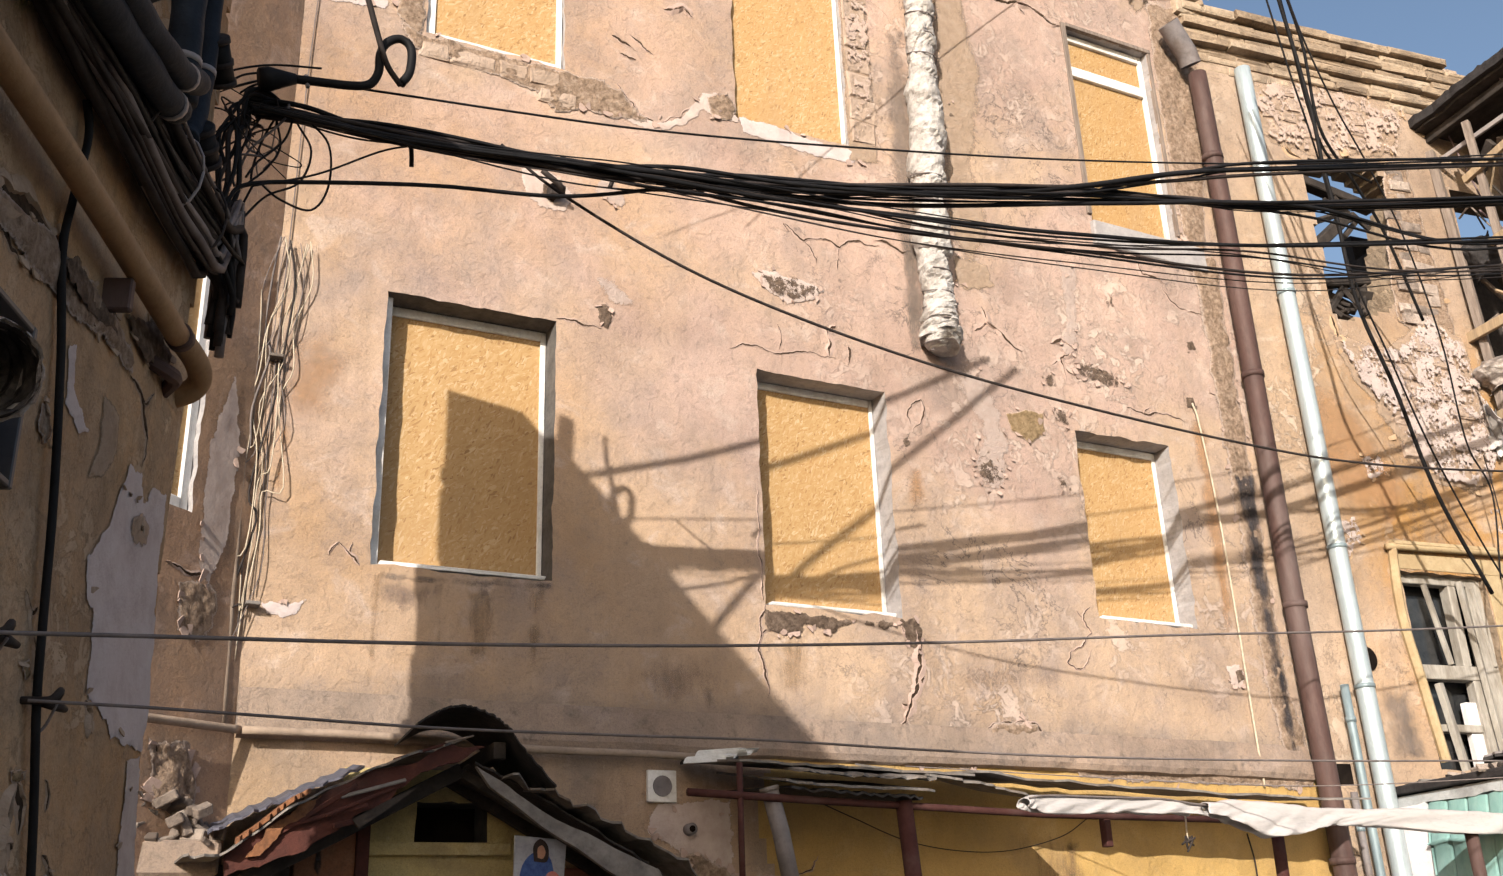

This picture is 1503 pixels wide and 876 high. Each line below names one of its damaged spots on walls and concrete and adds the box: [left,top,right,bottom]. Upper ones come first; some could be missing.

flaking render [332,0,878,166]
flaking render [934,0,994,290]
flaking render [0,172,135,373]
flaking render [177,376,246,642]
flaking render [751,266,824,304]
crack [729,324,852,365]
crack [782,222,914,270]
flaking render [958,366,1072,496]
flaking render [1129,0,1306,750]
flaking render [1254,82,1503,534]
flaking render [84,464,201,876]
crack [901,625,927,724]